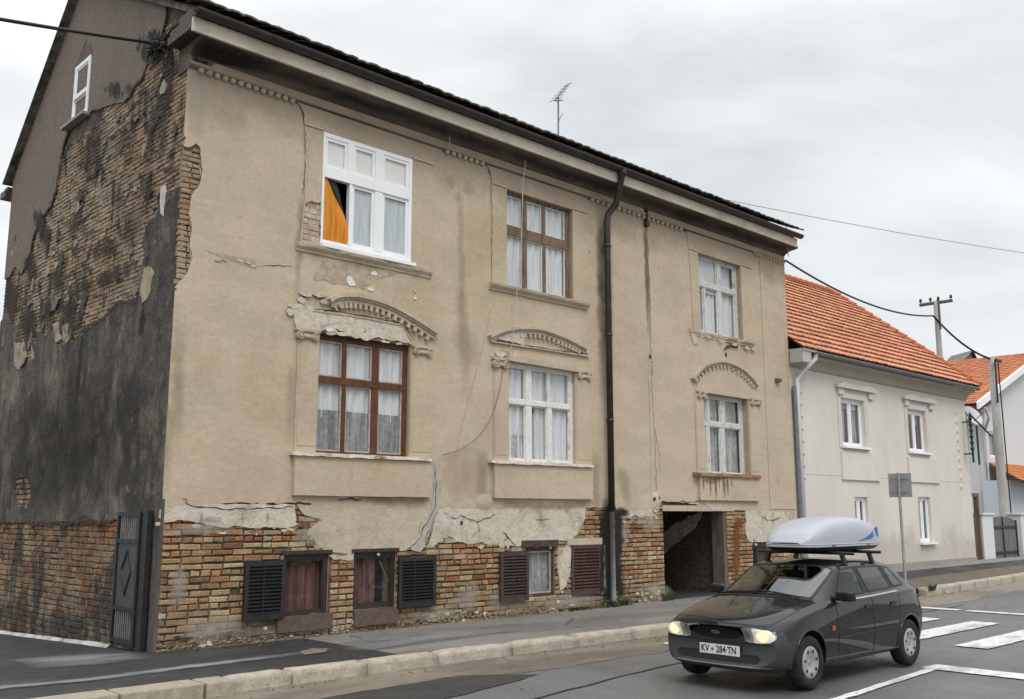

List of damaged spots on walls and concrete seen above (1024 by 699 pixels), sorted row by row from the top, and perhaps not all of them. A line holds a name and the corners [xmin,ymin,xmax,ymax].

flaking render [2,23,200,370]
flaking render [302,201,320,241]
leakage [7,209,150,398]
spalling [287,259,402,345]
flaking render [0,477,703,652]
crack [408,465,515,549]
flaking render [726,510,795,586]